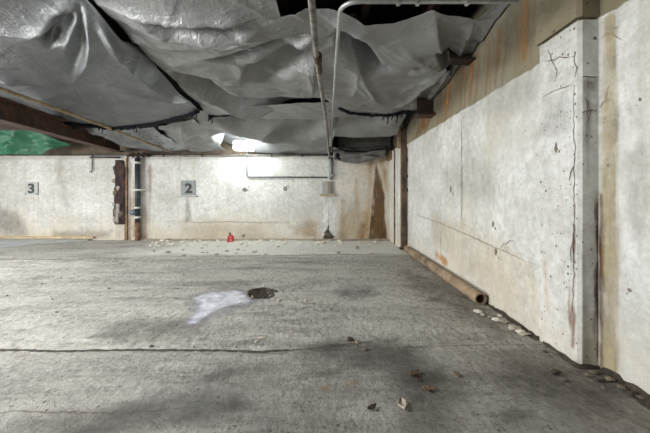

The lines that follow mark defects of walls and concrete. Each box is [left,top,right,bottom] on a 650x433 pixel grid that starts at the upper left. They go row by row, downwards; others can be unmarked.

crack [542,49,609,335]
crack [421,216,538,267]
water stain [188,291,250,324]
crack [0,341,370,354]